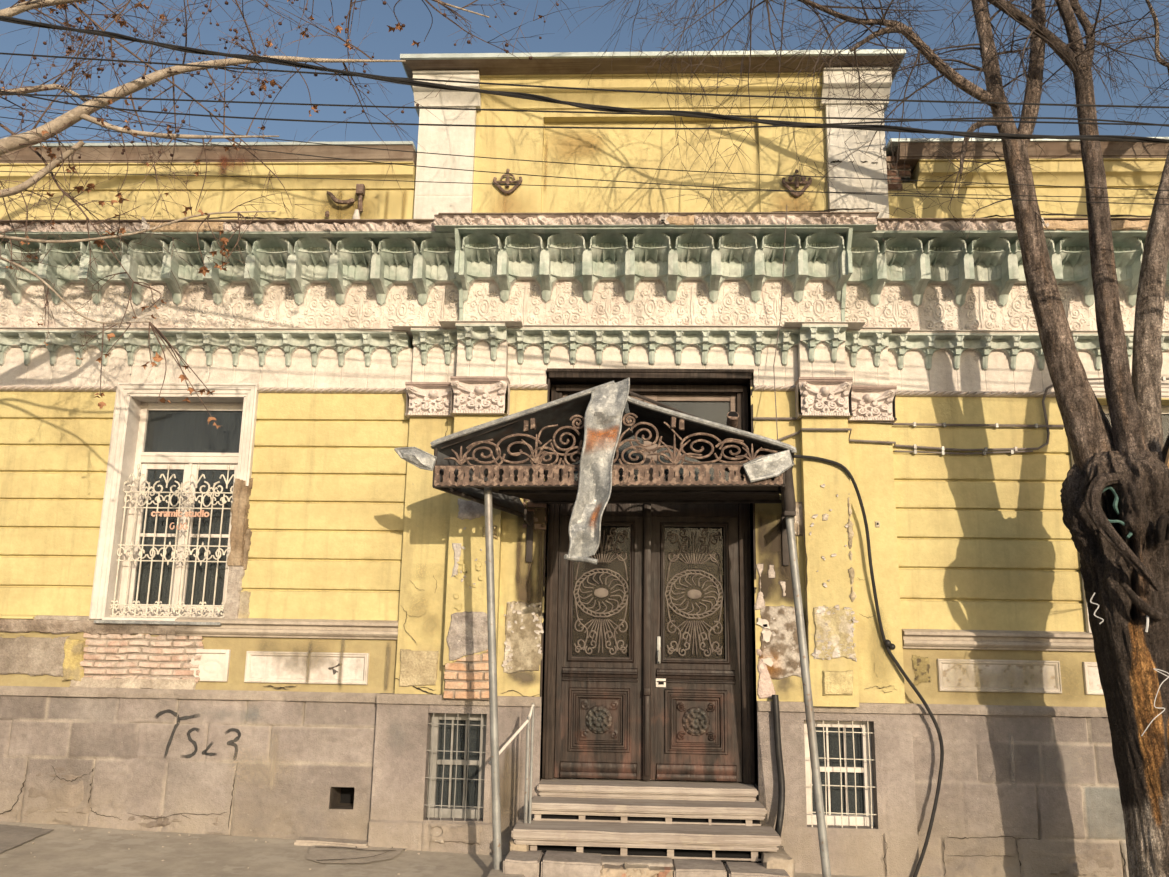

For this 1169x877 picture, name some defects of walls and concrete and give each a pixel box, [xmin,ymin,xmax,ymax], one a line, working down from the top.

corrosion [587,428,618,445]
spalling [243,529,252,570]
peeling [444,499,546,700]
flaking render [754,493,859,680]
flaking render [0,615,204,690]
crack [0,764,237,828]